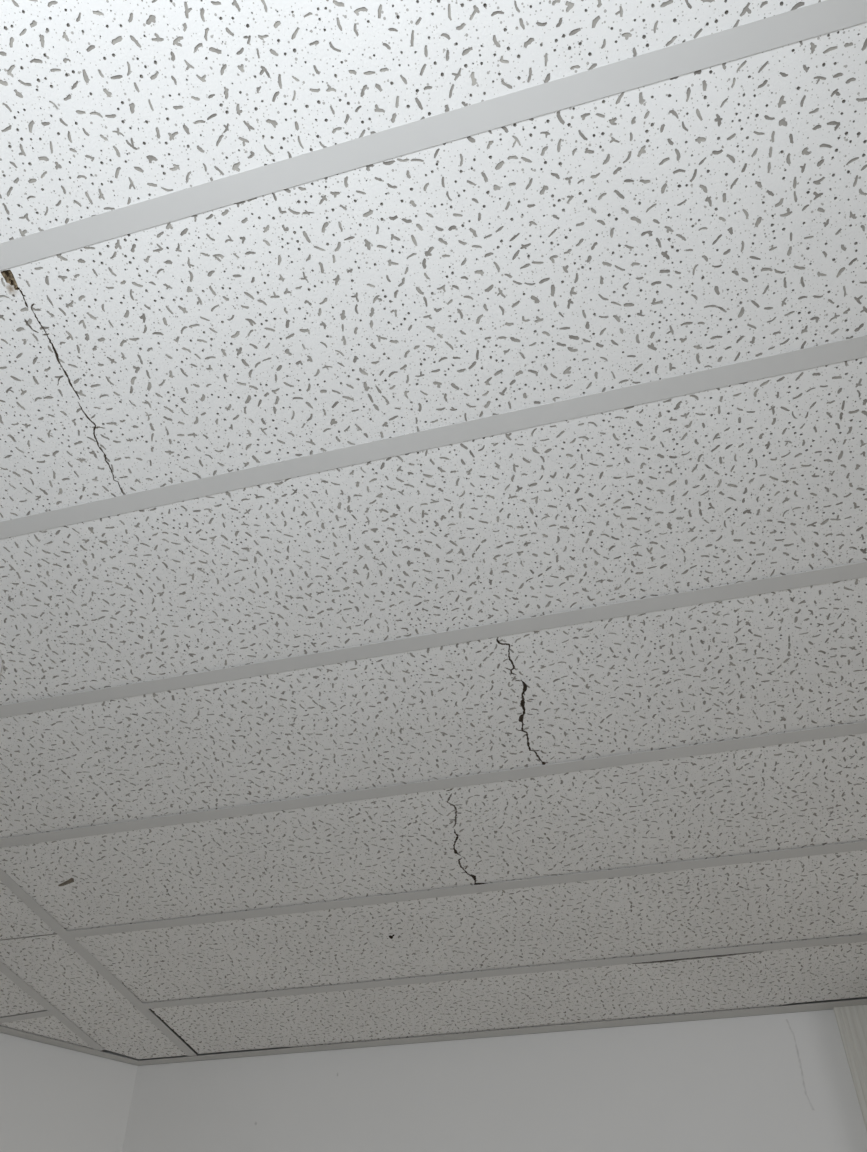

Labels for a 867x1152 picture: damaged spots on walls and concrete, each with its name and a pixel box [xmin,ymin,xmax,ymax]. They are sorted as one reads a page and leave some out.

crack [19,289,124,495]
crack [496,637,546,765]
crack [447,788,486,885]